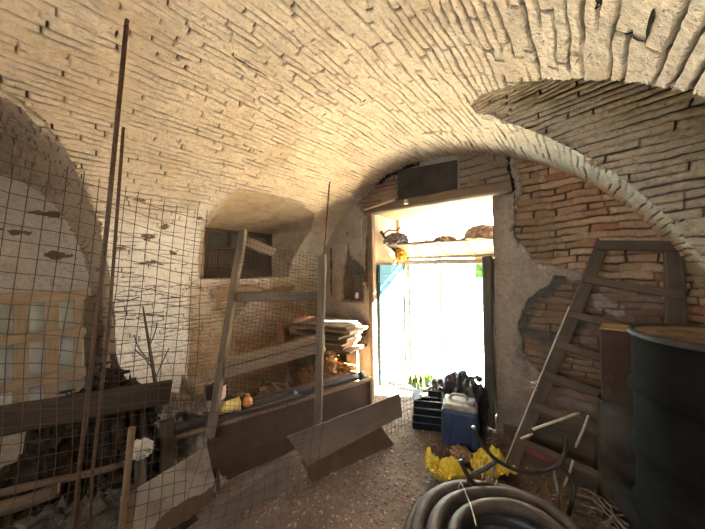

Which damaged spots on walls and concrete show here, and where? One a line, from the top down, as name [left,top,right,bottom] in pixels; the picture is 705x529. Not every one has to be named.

crack [507,156,516,213]